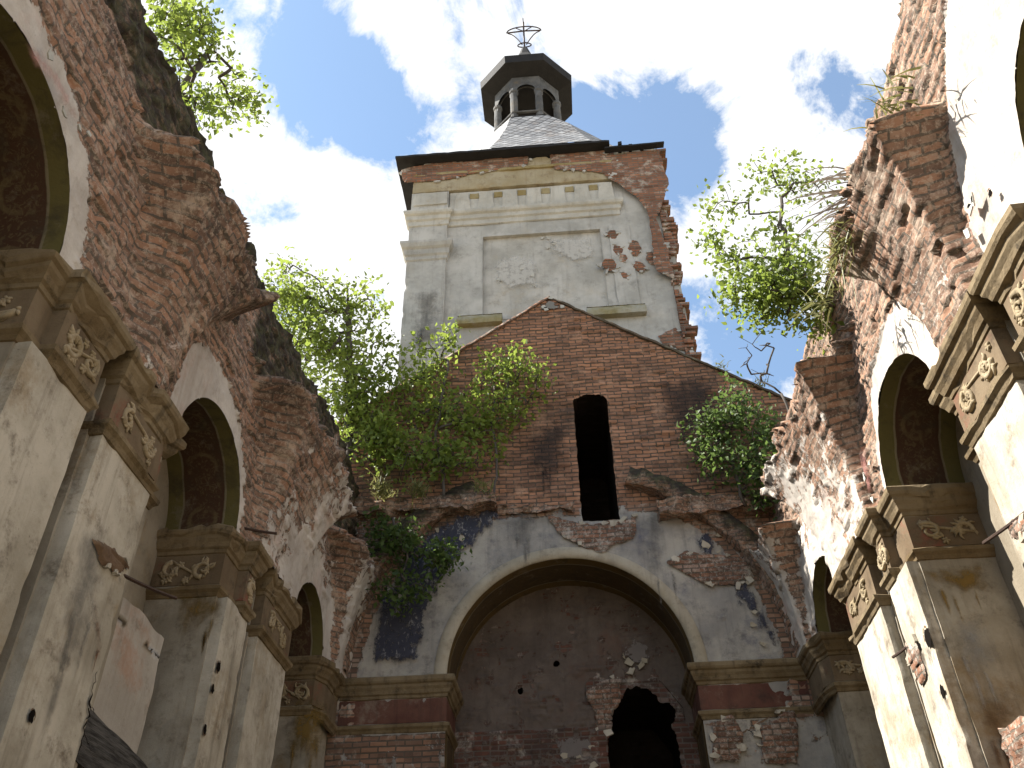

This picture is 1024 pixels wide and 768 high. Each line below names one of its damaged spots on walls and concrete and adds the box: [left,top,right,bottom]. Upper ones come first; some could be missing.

flaking render [398,156,533,183]
flaking render [536,148,702,360]
flaking render [92,539,130,576]
flaking render [548,513,638,553]
flaking render [667,533,776,646]
flaking render [905,625,931,686]
flaking render [556,638,651,768]
flaking render [709,705,799,765]